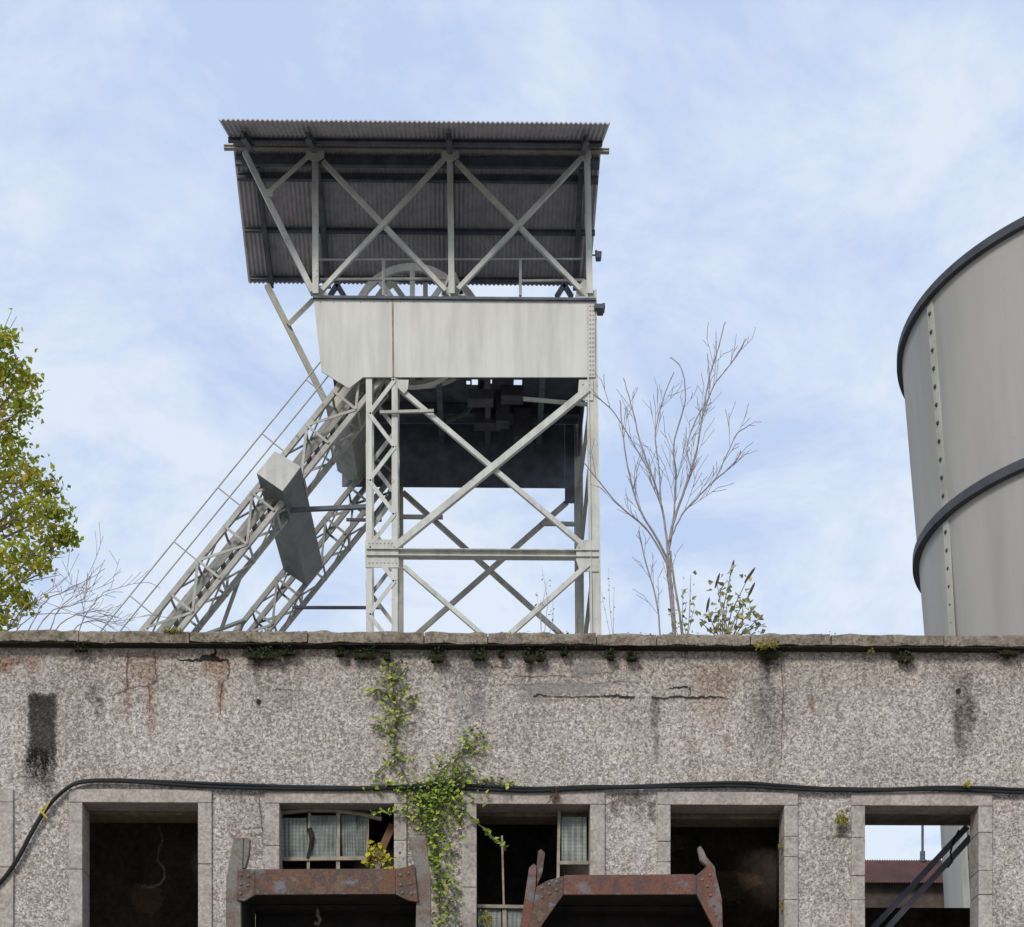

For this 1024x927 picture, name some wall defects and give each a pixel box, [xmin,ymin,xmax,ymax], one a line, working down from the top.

crack [111,649,292,715]
crack [491,666,729,699]